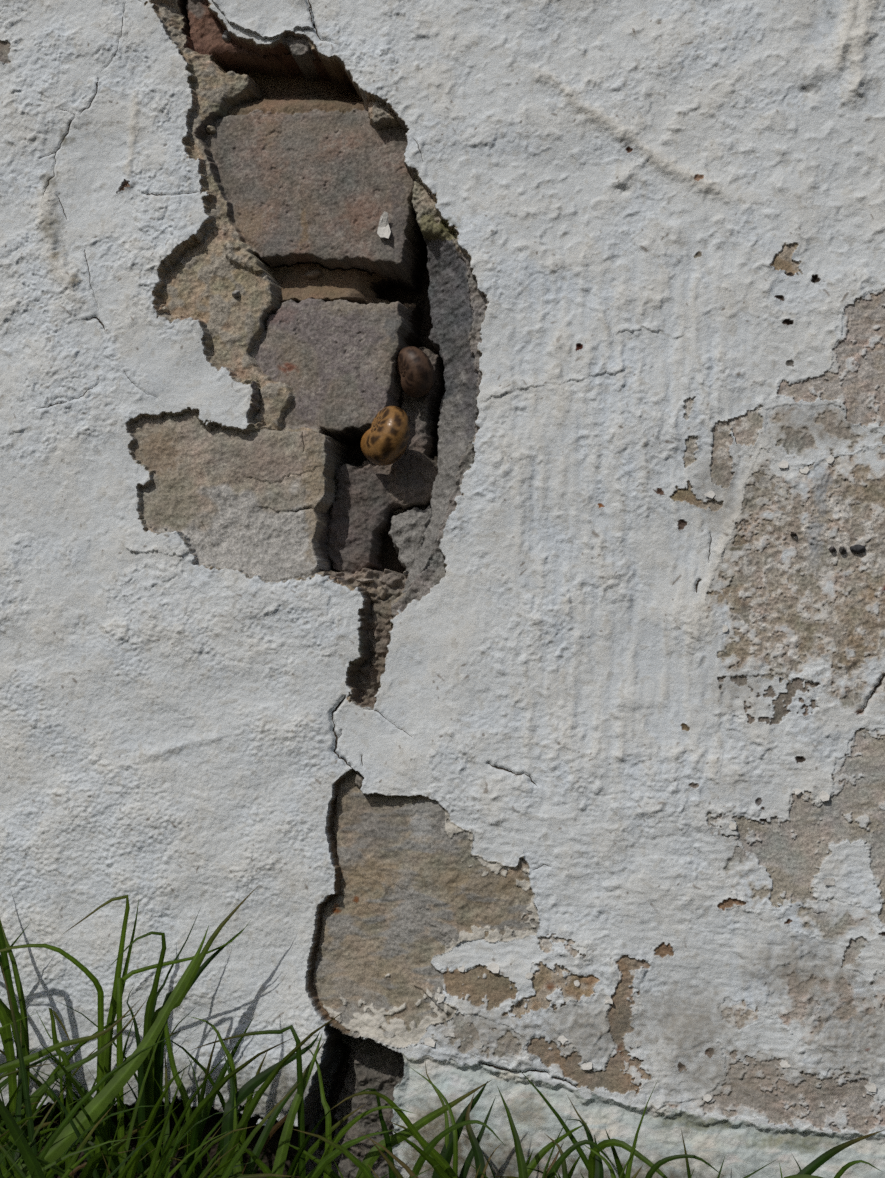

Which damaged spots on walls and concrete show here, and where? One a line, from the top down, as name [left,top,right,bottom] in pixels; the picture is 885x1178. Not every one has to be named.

peeling [0,40,11,65]
crack [308,0,336,44]
crack [41,0,140,219]
crack [84,250,104,328]
peeling [770,242,821,283]
spalling [125,0,489,709]
crack [332,695,413,769]
peeling [653,285,885,1135]
spalling [296,769,674,1178]